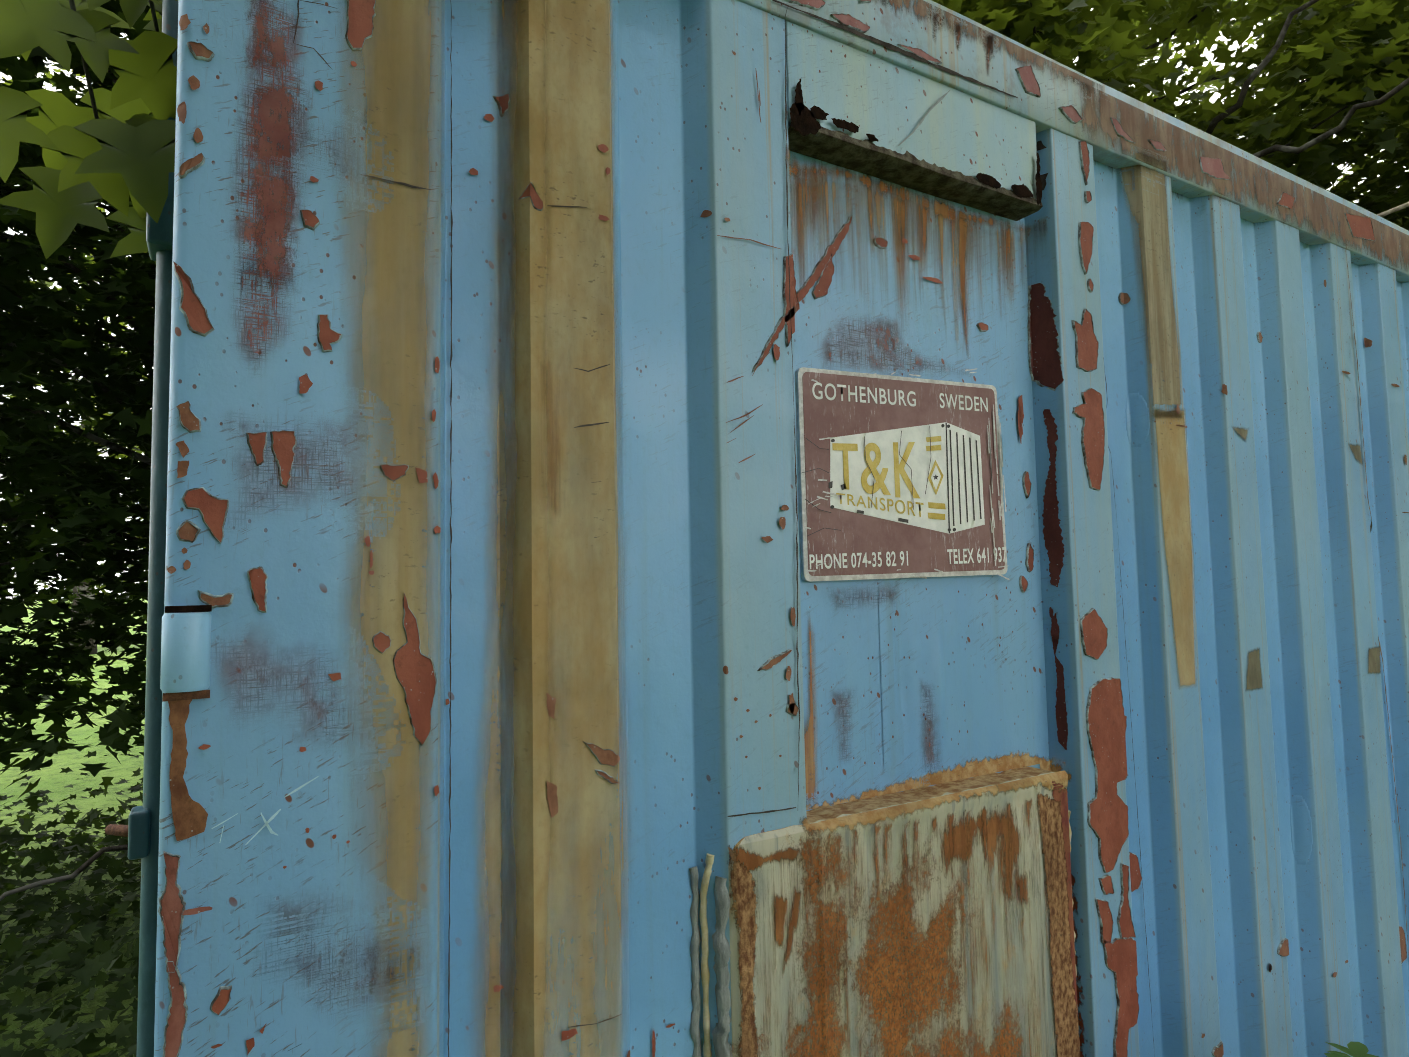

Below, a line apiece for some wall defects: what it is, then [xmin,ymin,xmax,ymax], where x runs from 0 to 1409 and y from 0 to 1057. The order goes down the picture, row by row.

peeling [173,261,215,337]
peeling [752,216,852,372]
corrosion [788,150,1023,345]
peeling [1027,222,1105,491]
corrosion [883,0,1409,532]
peeling [1019,409,1064,593]
peeling [372,594,450,746]
peeling [1080,608,1108,660]
peeling [158,851,212,1057]
corrosion [728,625,1087,1057]
peeling [1086,677,1142,1057]
corrosion [1378,637,1409,953]